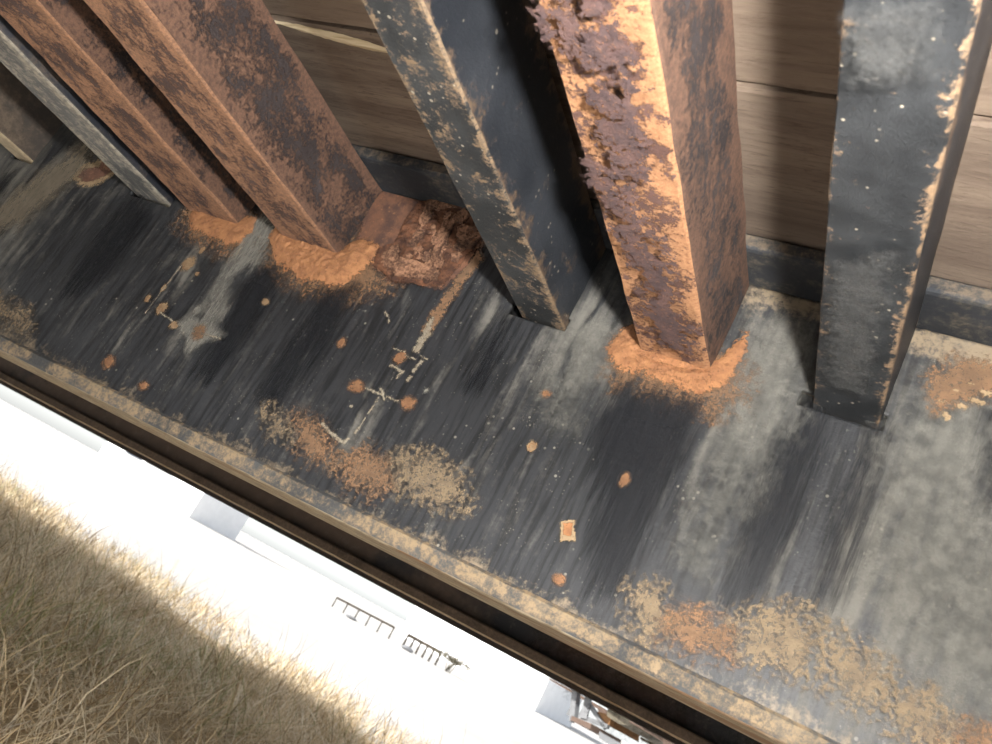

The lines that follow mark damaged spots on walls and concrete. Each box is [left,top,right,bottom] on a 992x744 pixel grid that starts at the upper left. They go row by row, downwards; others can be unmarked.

leakage [178,215,279,382]
leakage [259,284,358,405]
rust [170,191,486,364]
rust [288,405,404,505]
leakage [584,381,699,596]
leakage [722,407,821,606]
leakage [812,421,891,610]
rust [652,601,742,670]